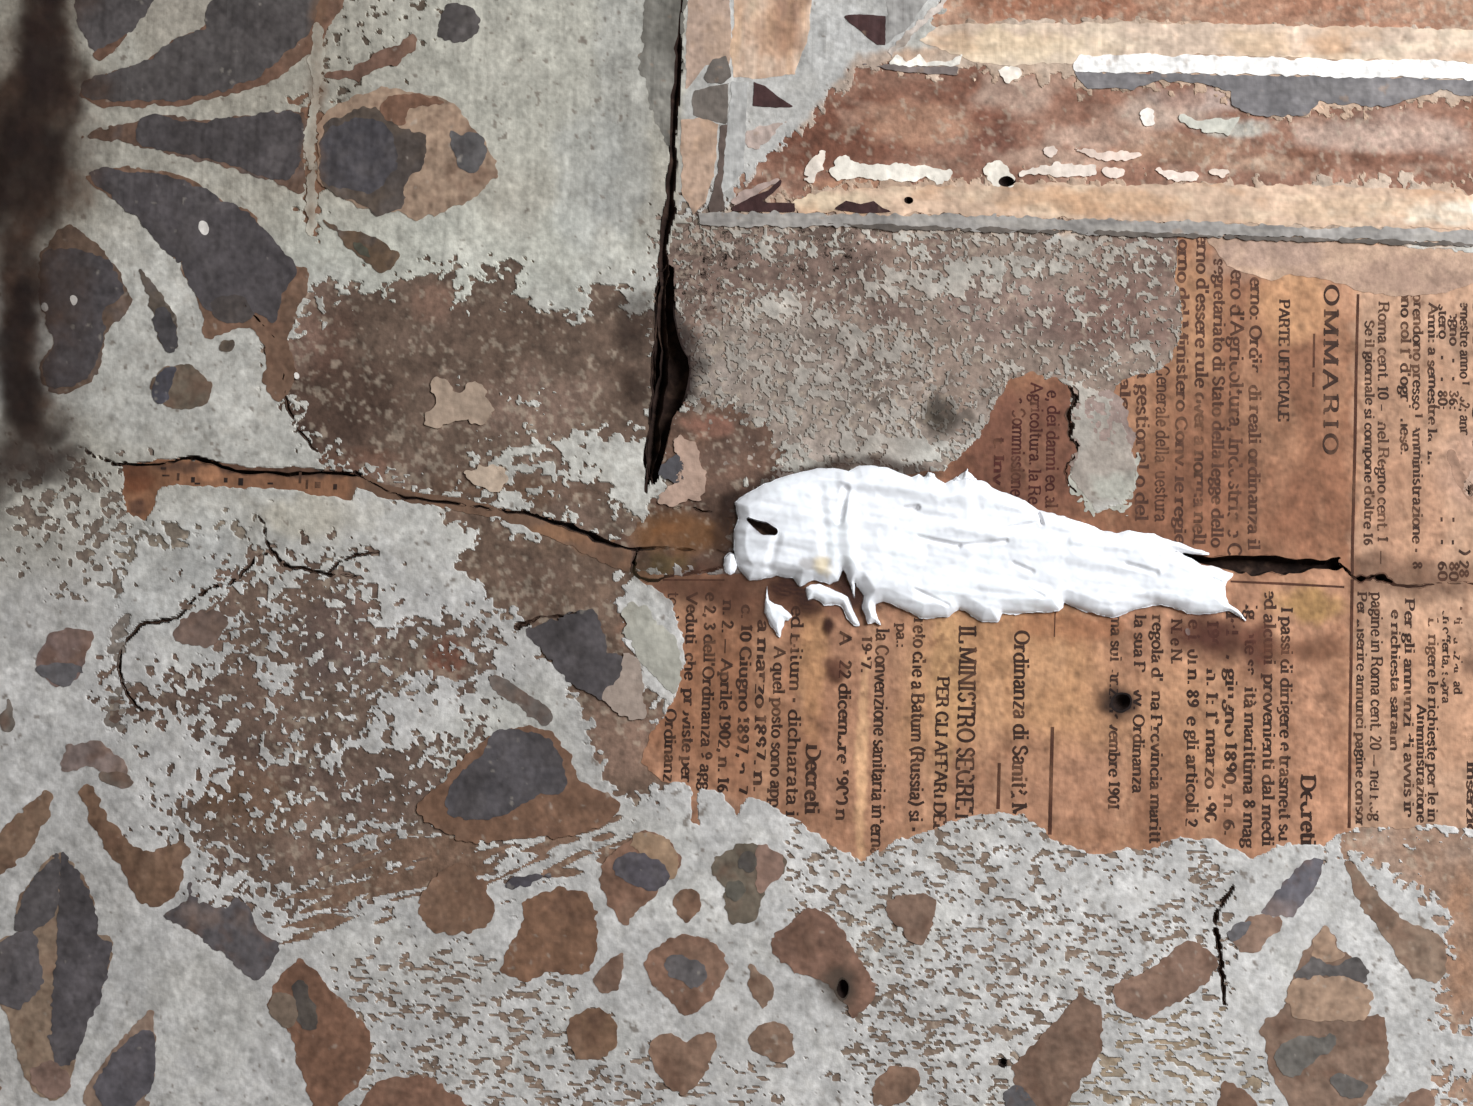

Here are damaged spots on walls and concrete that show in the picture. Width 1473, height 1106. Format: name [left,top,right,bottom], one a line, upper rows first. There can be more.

peeling [704,56,731,84]
water stain [0,0,89,489]
crack [85,0,734,583]
peeling [6,447,201,602]
crack [117,517,380,712]
peeling [88,62,1473,944]
crack [1183,553,1473,588]
peeling [331,937,716,1106]
peeling [785,814,1274,1106]
crack [1213,886,1234,1005]
peeling [1323,824,1473,1036]
peeling [1431,1057,1473,1106]